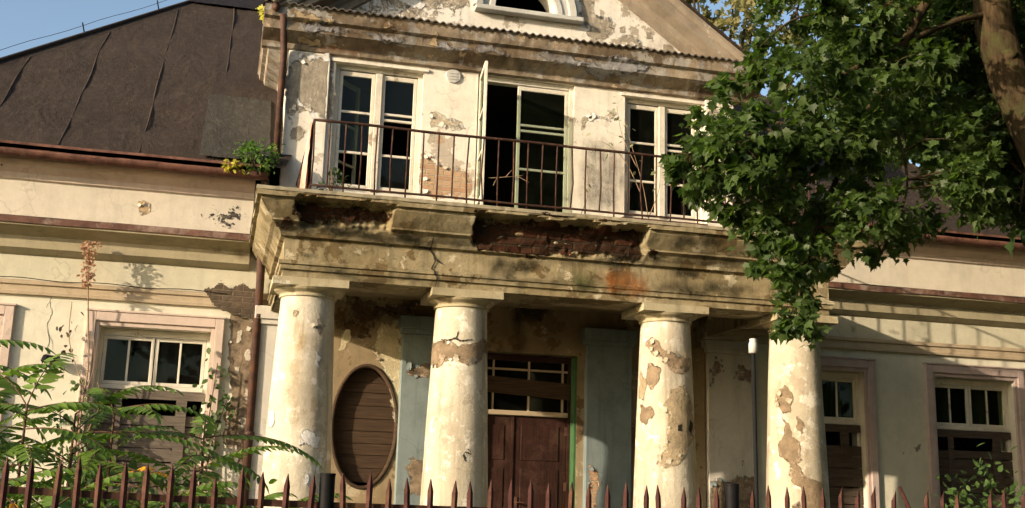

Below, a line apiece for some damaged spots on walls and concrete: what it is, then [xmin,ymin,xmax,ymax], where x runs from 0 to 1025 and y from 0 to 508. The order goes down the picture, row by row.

flaking render [284,0,511,141]
peeling [539,0,675,81]
flaking render [418,110,472,200]
crack [419,238,443,287]
damp [493,259,535,277]
peeling [338,329,351,351]
peeling [405,456,423,495]
peeling [371,319,488,426]
peeling [638,337,695,469]
peeling [774,385,827,508]